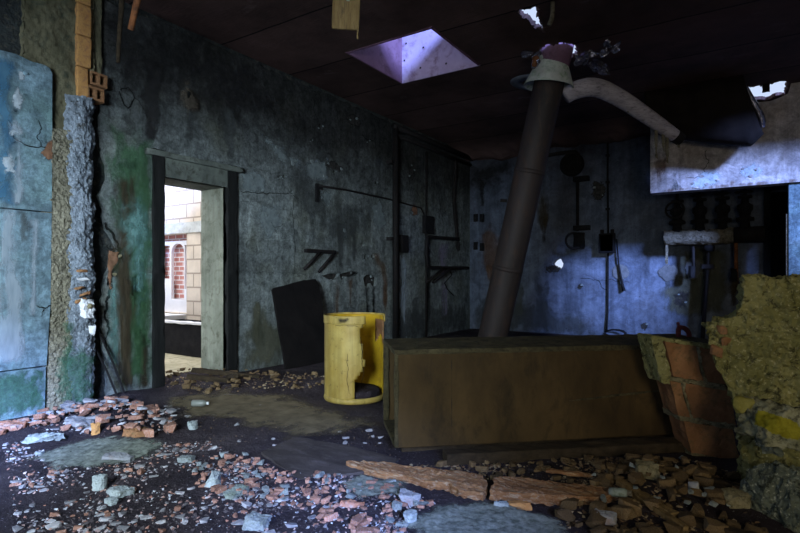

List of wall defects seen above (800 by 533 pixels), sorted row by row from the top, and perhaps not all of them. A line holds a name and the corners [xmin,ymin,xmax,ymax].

leakage [0,60,21,204]
crack [119,87,148,124]
crack [104,222,123,346]
leakage [110,179,148,388]